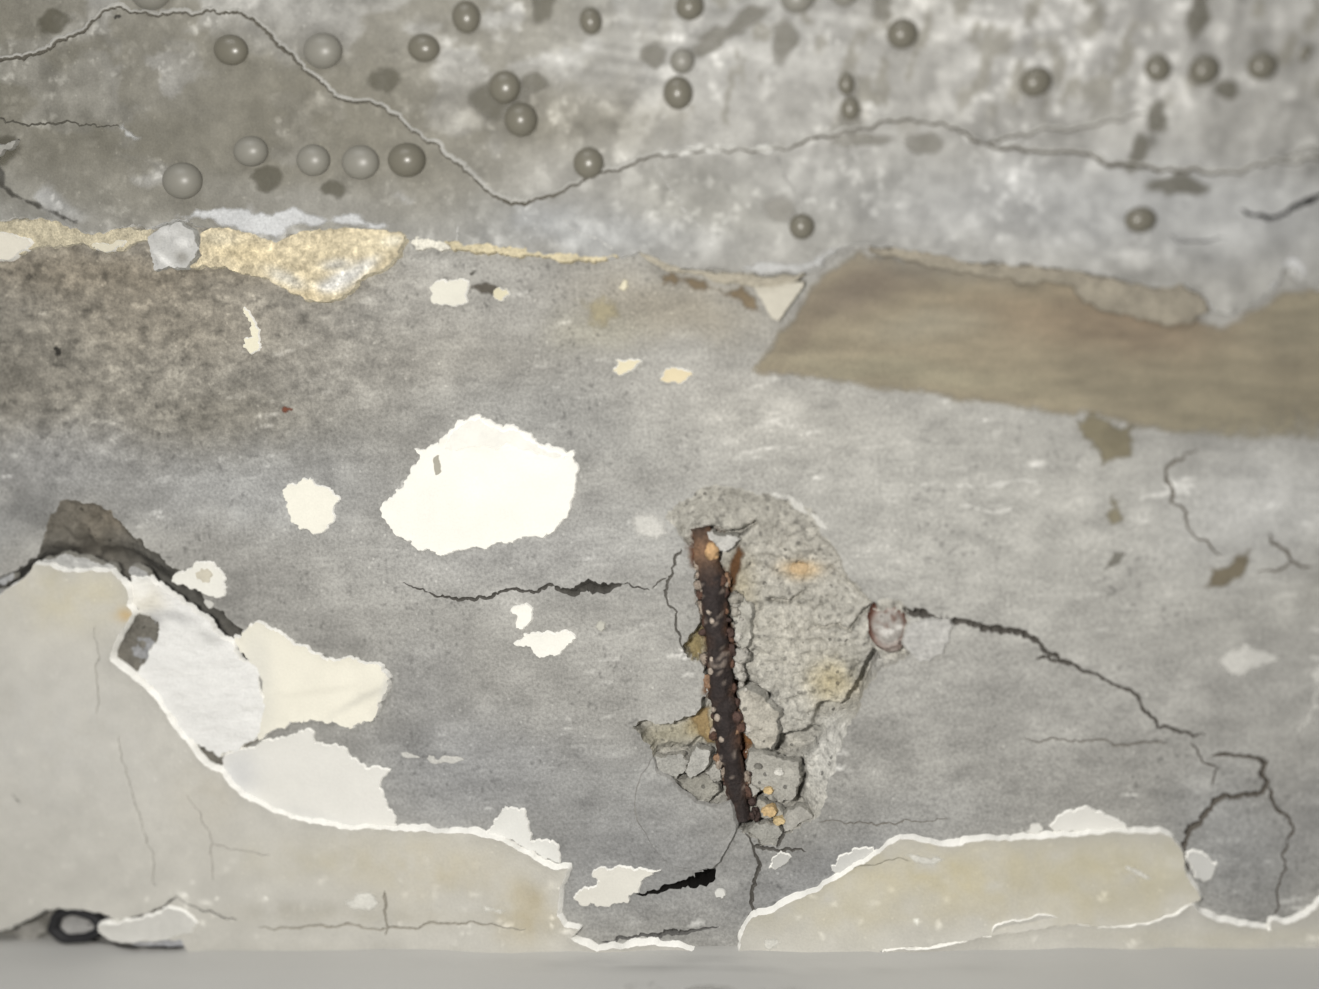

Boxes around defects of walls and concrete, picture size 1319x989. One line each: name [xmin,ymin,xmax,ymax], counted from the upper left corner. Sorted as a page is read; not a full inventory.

crack [0,2,1319,207]
peeling [0,0,1319,322]
crack [1240,194,1319,221]
leakage [755,253,1319,463]
peeling [0,499,695,953]
peeling [380,414,580,556]
crack [403,549,685,653]
rust [686,526,761,823]
spalling [632,484,954,870]
crack [902,607,1295,913]
leakage [1105,553,1125,569]
leakage [1209,556,1248,586]